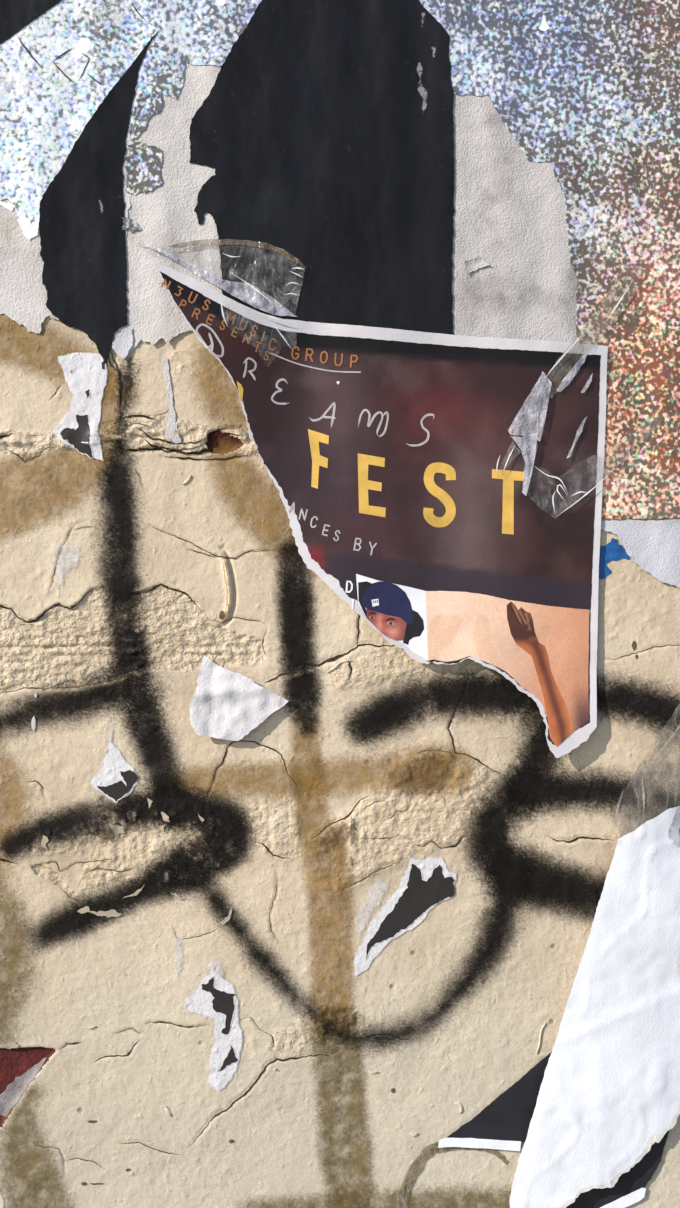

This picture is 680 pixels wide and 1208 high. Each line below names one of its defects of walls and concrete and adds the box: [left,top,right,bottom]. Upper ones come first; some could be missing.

spalling [0,430,76,460]
spalling [97,415,259,457]
crack [0,519,100,623]
crack [416,662,506,777]
crack [185,740,303,794]
crack [56,1021,208,1063]
crack [121,1017,404,1155]